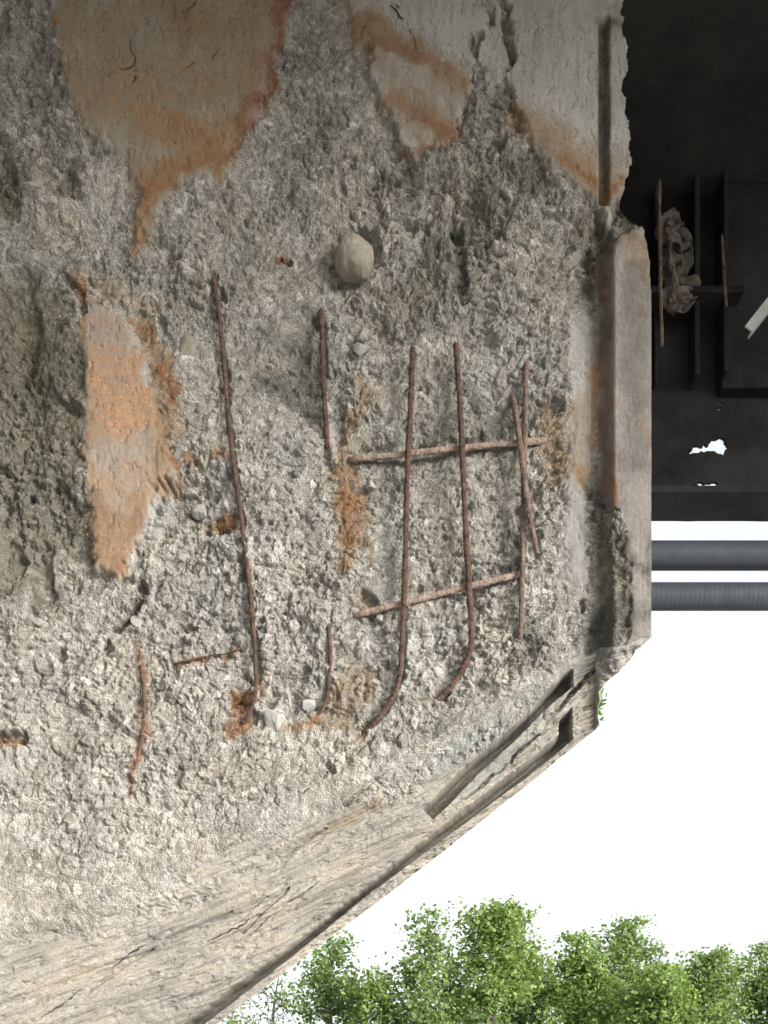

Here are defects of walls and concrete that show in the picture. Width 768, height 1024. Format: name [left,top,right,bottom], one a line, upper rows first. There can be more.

rust [215,0,290,181]
rust [76,272,197,576]
rust [207,510,238,535]
spalling [0,0,638,940]
rust [224,685,265,739]